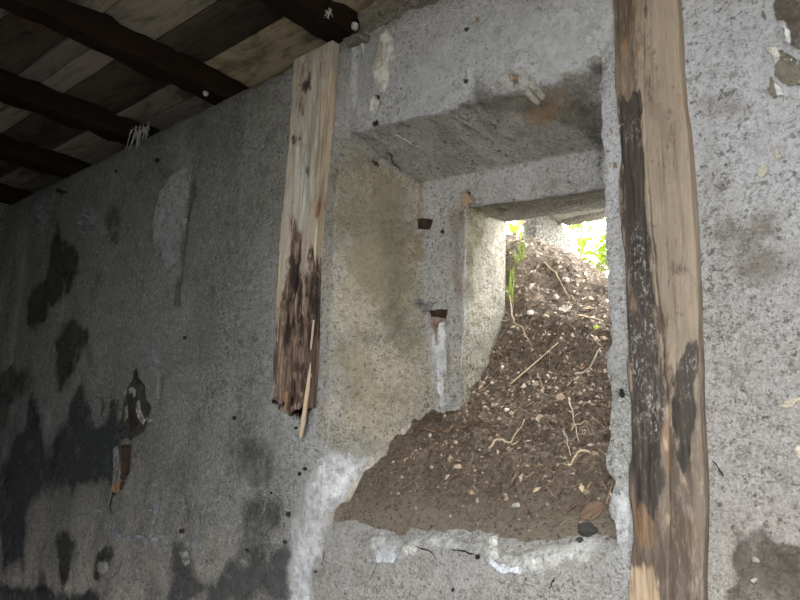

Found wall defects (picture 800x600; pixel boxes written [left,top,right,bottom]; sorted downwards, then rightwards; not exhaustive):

peeling [350,29,397,126]
spalling [490,67,545,106]
spalling [761,0,800,99]
leakage [27,222,78,326]
peeling [118,368,152,441]
leakage [0,585,98,600]
leakage [0,389,121,571]
leakage [56,532,74,582]
leakage [93,547,113,580]
leakage [135,450,388,600]